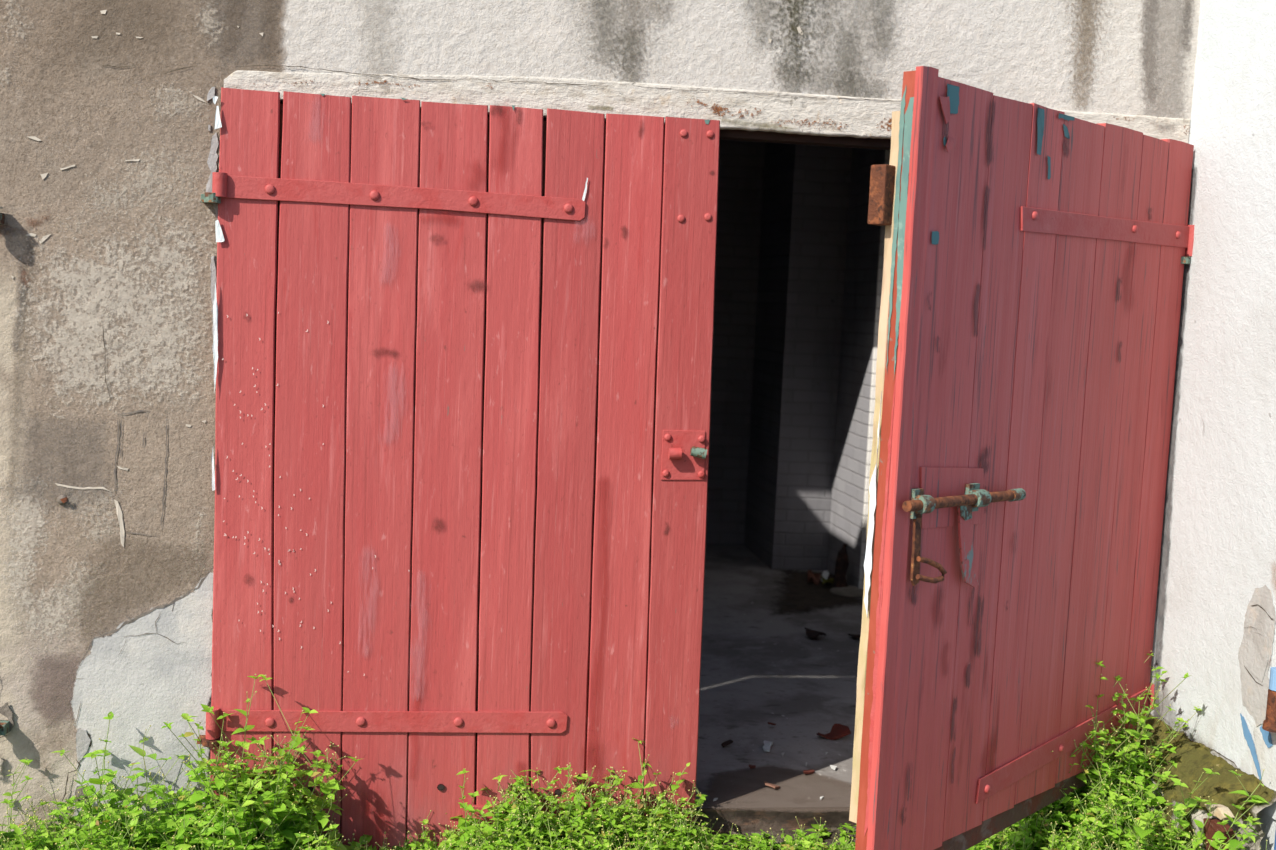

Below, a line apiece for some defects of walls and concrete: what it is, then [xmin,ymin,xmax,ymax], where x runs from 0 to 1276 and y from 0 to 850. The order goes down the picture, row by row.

corrosion [687,100,764,118]
flaking render [1238,585,1276,738]